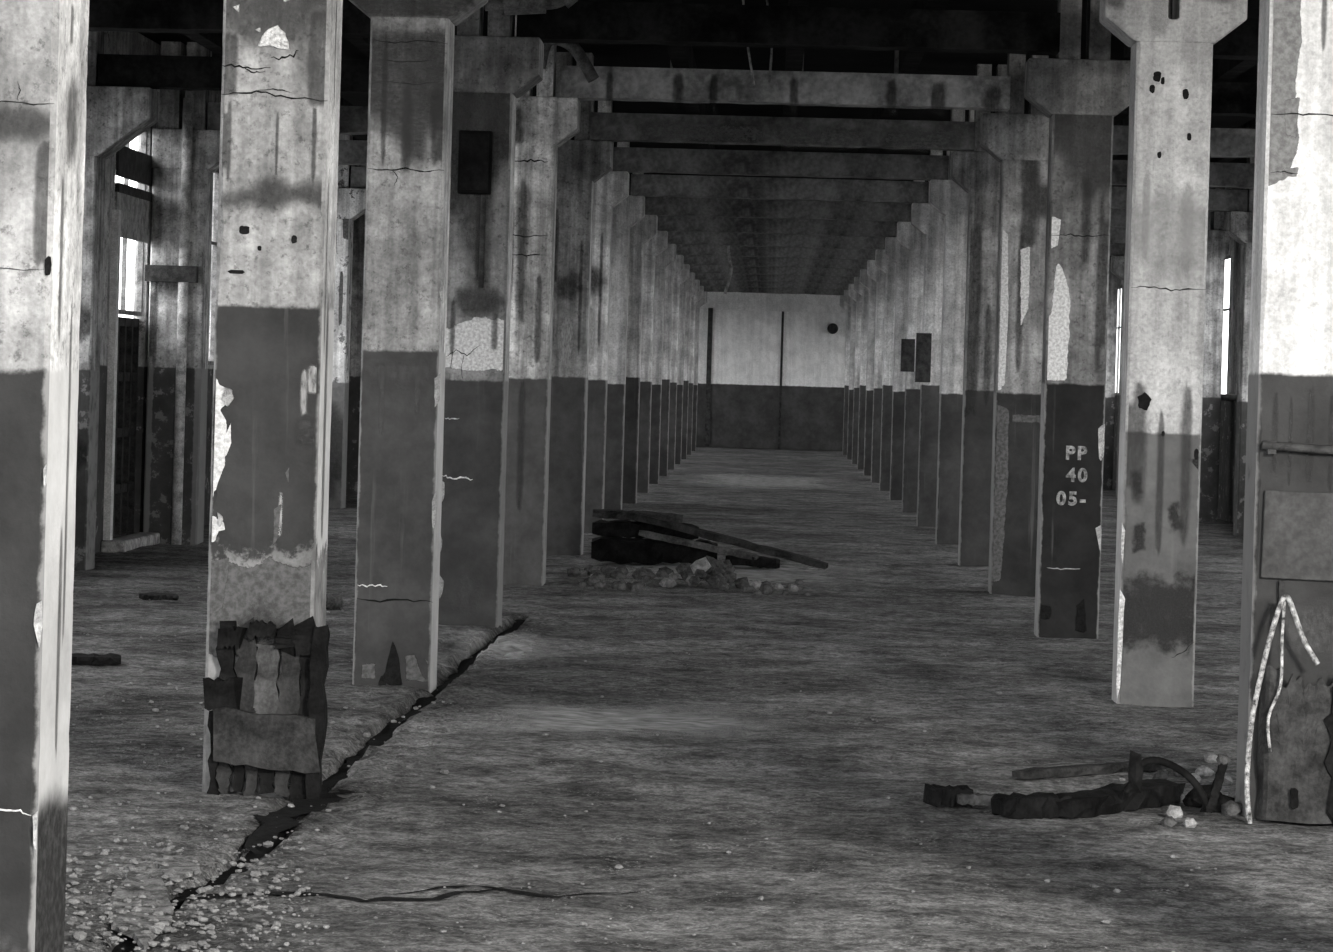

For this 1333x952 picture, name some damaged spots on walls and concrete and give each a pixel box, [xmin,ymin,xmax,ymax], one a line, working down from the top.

spalling [255,25,289,50]
peeling [1268,0,1302,186]
peeling [213,379,231,495]
peeling [209,504,311,657]
crack [108,620,640,952]